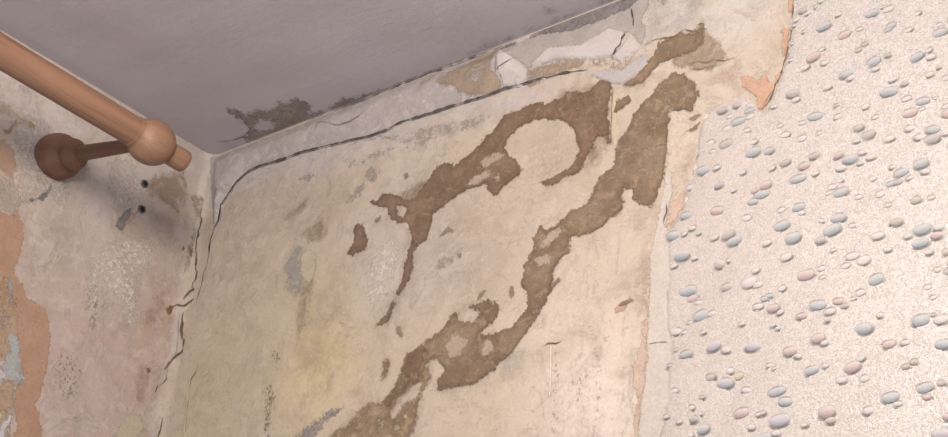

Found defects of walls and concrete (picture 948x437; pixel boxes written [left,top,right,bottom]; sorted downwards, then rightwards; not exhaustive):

spalling [495,0,705,89]
flaking render [0,139,16,177]
crack [155,43,588,392]
flaking render [0,211,51,437]
spalling [615,299,633,313]